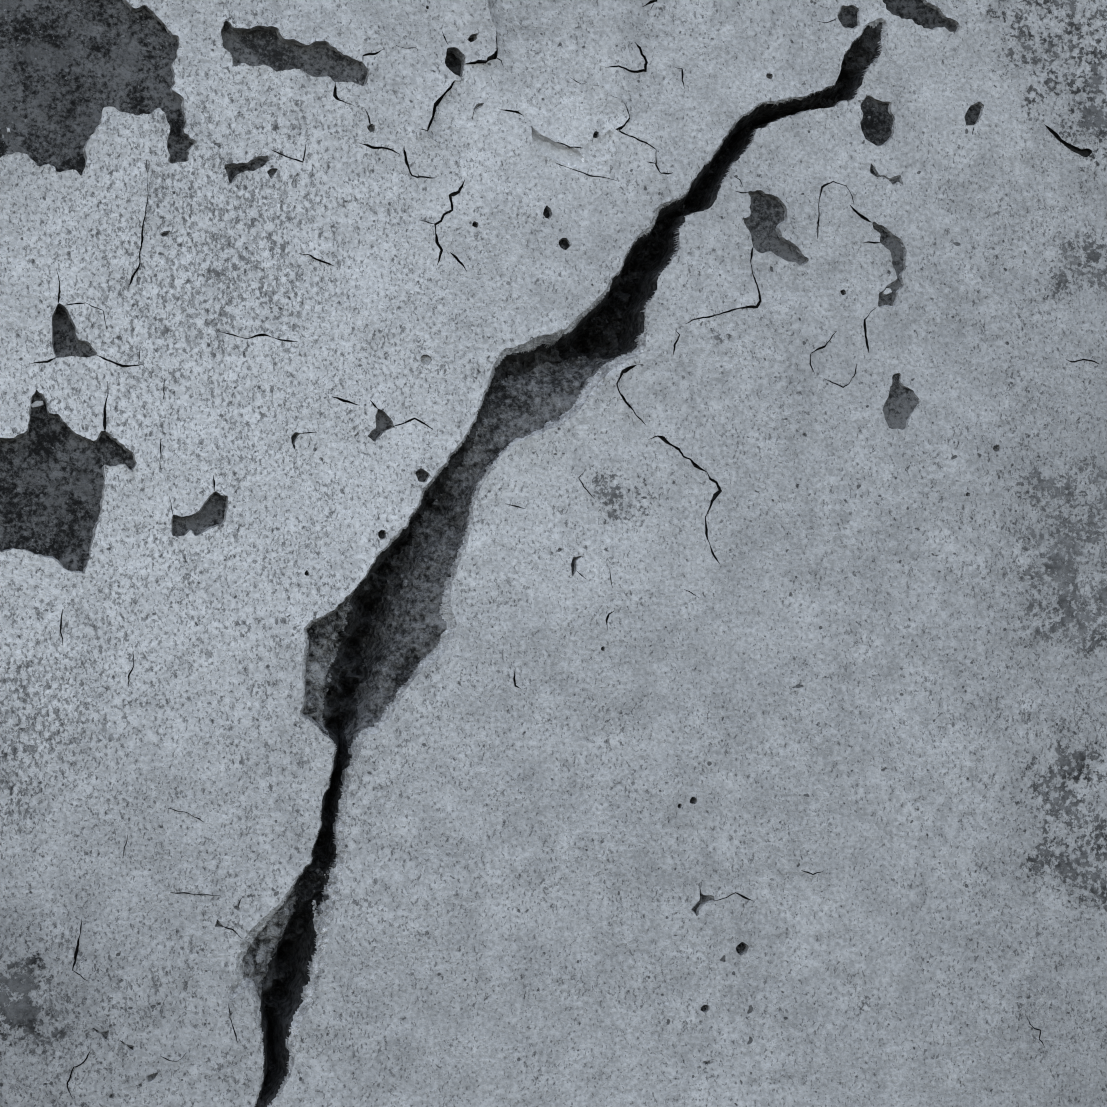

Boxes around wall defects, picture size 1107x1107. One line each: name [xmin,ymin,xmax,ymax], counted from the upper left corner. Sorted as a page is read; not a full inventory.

peeling [0,0,196,176]
peeling [221,11,383,131]
spalling [860,95,895,147]
peeling [883,0,960,32]
spalling [31,269,143,367]
peeling [673,176,809,355]
peeling [817,181,907,352]
spalling [883,373,920,430]
peeling [0,381,137,574]
spalling [169,475,228,536]
crack [219,18,888,1107]